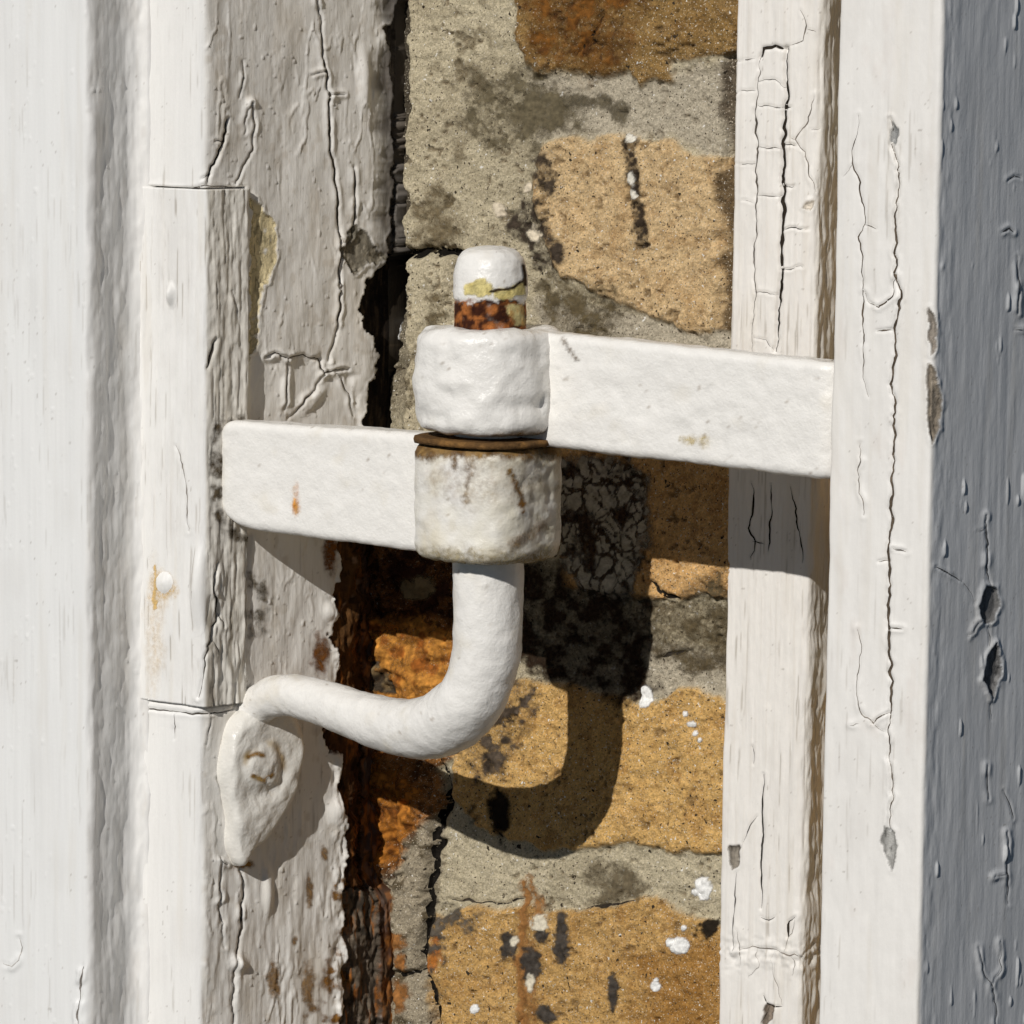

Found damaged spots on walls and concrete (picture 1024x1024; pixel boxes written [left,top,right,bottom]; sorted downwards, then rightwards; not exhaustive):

peeling [249,199,277,360]
crack [268,5,356,418]
spalling [340,2,398,428]
corrosion [454,299,527,330]
crack [744,10,817,350]
crack [847,115,904,829]
peeling [980,586,1000,623]
peeling [983,644,1002,696]
corrosion [368,751,425,866]
corrosion [392,933,409,1013]
corrosion [513,876,546,1024]
crack [732,782,802,1018]